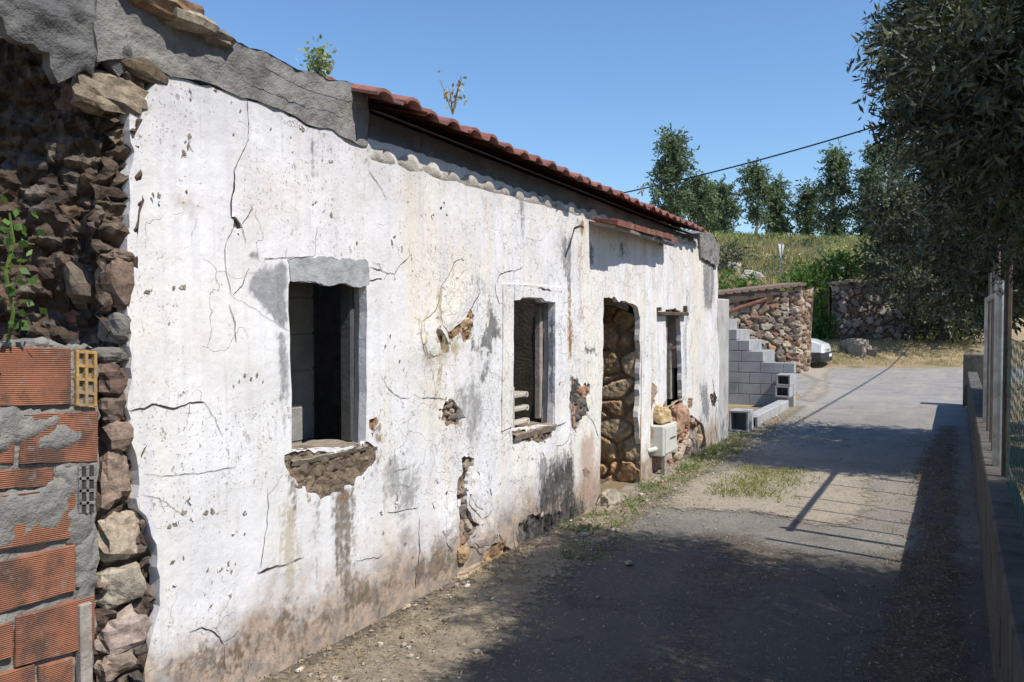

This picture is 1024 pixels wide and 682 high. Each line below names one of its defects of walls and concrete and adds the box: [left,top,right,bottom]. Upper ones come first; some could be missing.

crack [225,102,317,342]
damp [249,263,288,397]
crack [384,258,462,402]
spalling [436,309,474,353]
crack [130,401,223,436]
spalling [284,419,378,499]
spalling [432,453,477,547]
damp [518,447,587,546]
spalling [559,377,589,435]
damp [331,487,391,621]
crack [191,627,238,668]
damp [167,607,330,679]